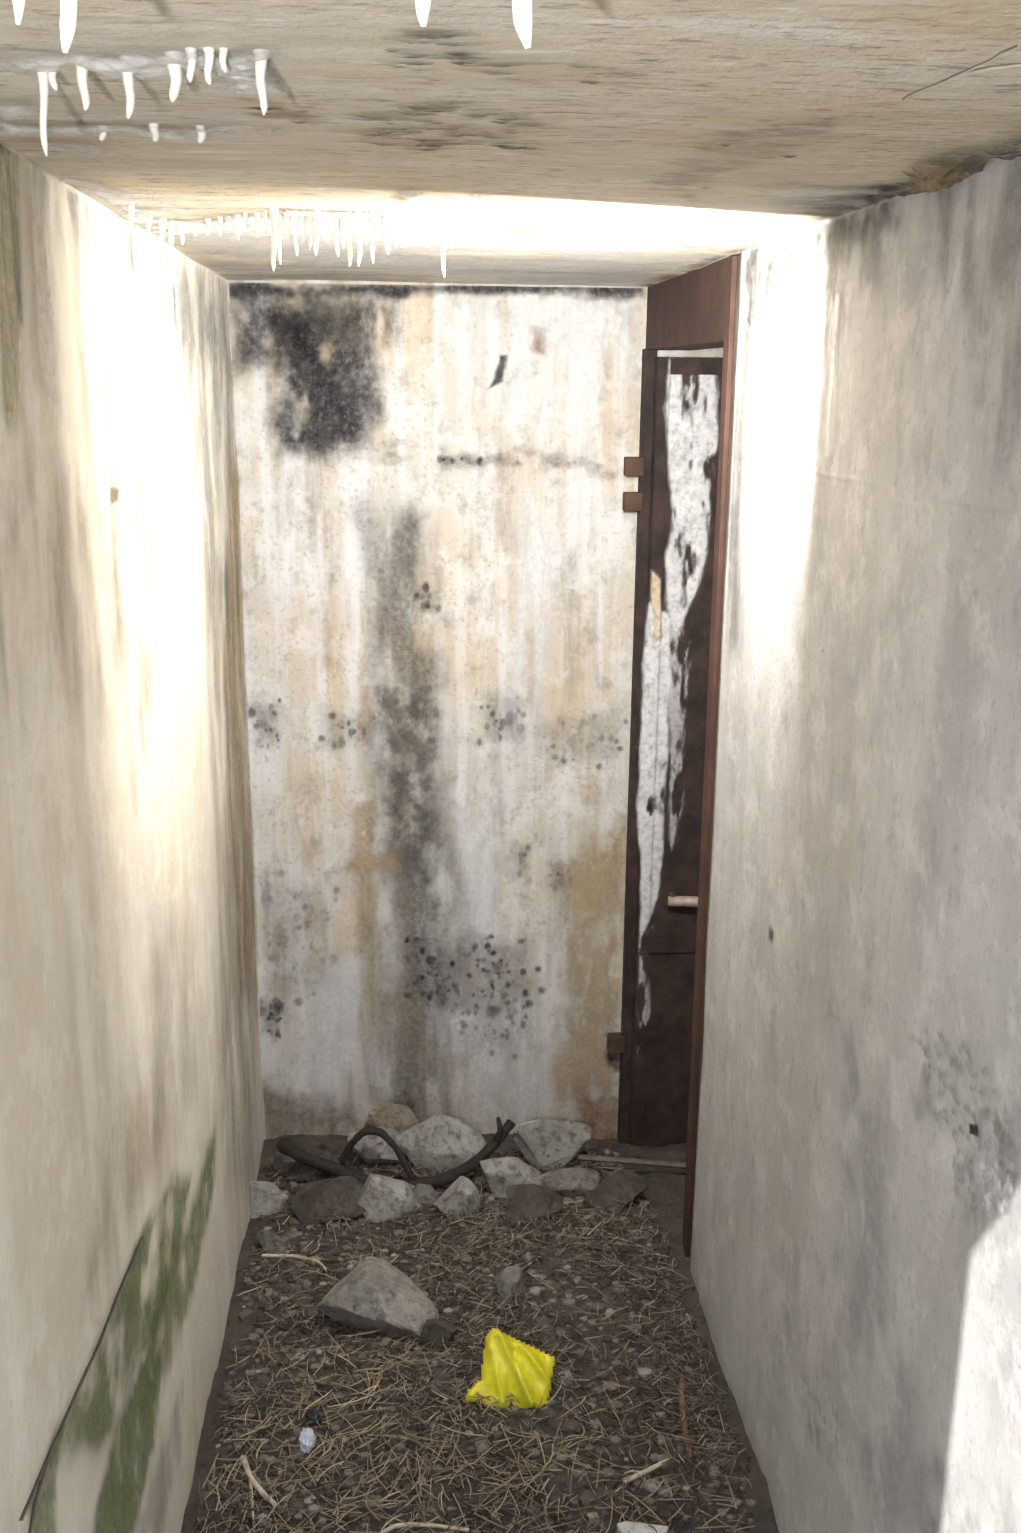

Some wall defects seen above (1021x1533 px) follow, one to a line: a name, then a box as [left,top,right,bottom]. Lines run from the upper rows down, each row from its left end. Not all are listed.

water stain [67,180,896,455]
water stain [348,528,544,1121]
peeling [640,961,650,1023]
peeling [637,356,718,937]
water stain [34,1481,55,1533]
water stain [98,1136,215,1533]